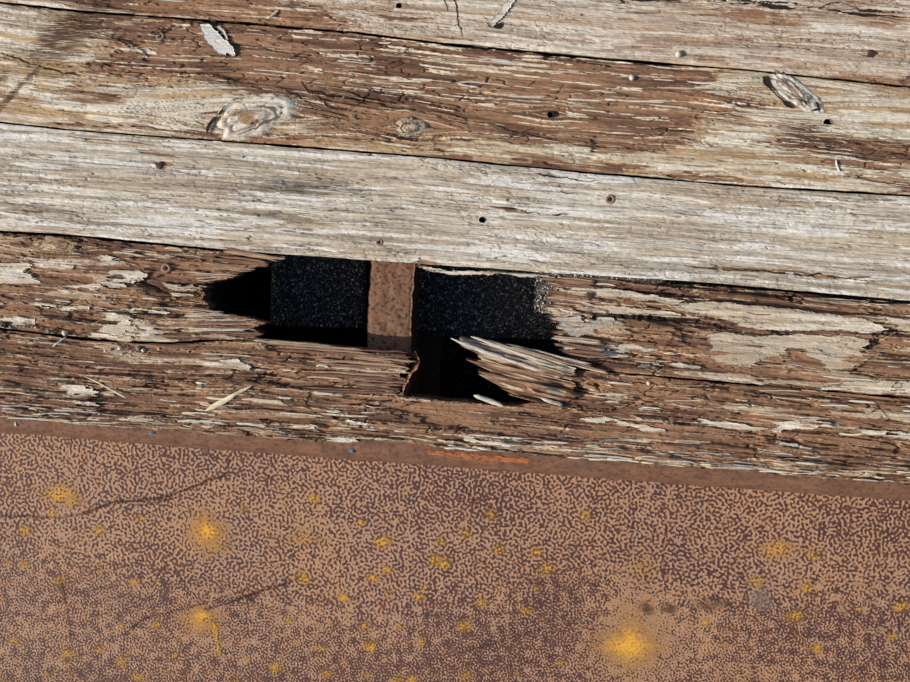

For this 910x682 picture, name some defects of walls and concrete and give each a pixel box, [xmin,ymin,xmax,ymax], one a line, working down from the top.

peeling [0,263,40,284]
peeling [59,255,149,292]
peeling [415,264,560,278]
peeling [87,307,171,343]
peeling [549,287,910,371]
peeling [682,417,818,449]
rust [425,450,530,464]
rust [41,485,77,517]
rust [188,513,228,555]
rust [428,537,451,570]
rust [180,603,221,657]
rust [595,614,661,672]